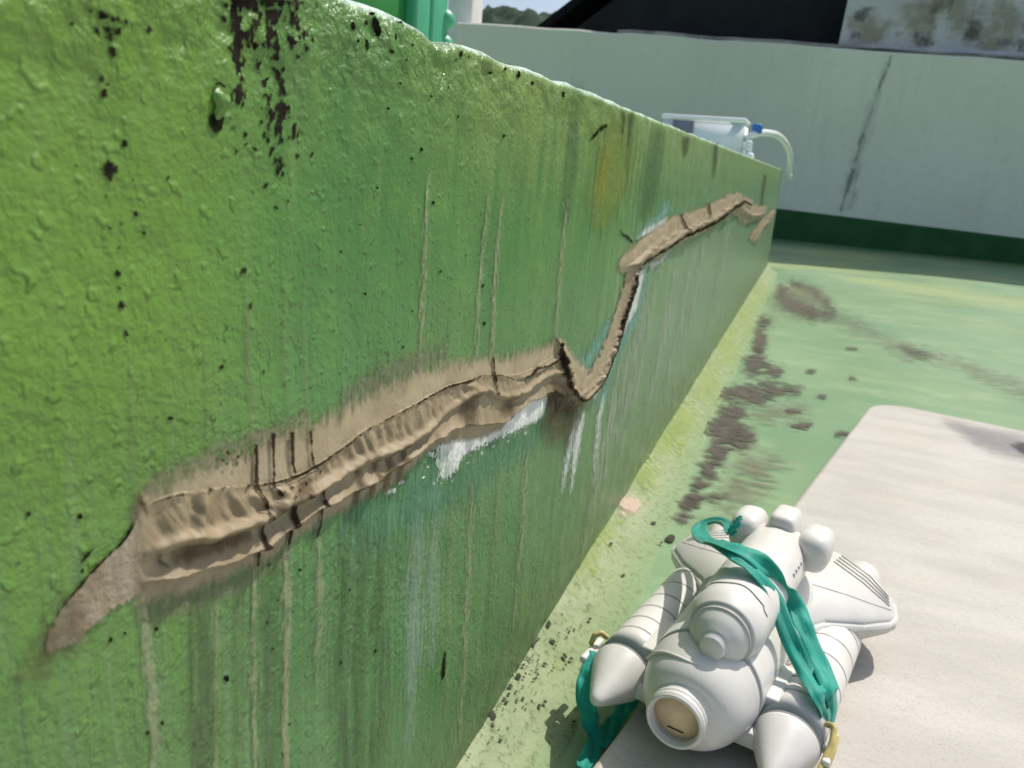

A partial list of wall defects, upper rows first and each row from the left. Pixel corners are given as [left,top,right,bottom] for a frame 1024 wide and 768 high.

peeling [637,202,669,239]
peeling [592,250,670,400]
damp [774,281,838,321]
peeling [358,396,549,545]
crack [134,192,775,617]
damp [561,392,606,566]
flaking render [619,496,641,515]
damp [674,315,803,522]
damp [785,408,813,429]
damp [963,429,1024,453]
flaking render [46,510,141,654]